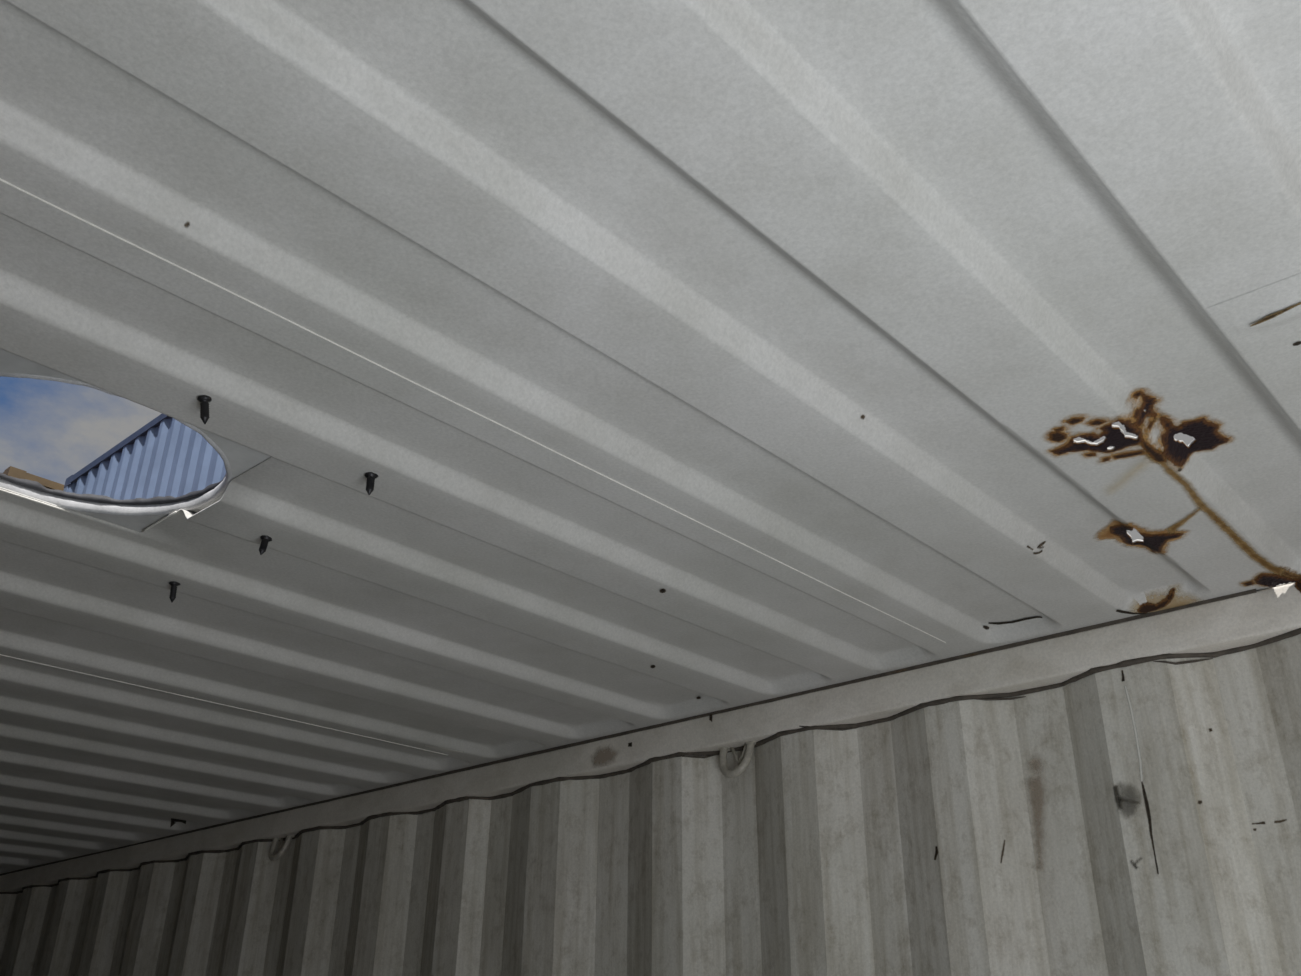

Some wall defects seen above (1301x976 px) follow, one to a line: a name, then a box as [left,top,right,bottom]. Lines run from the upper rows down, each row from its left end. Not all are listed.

rust [1047,388,1301,593]
crack [1121,670,1159,874]